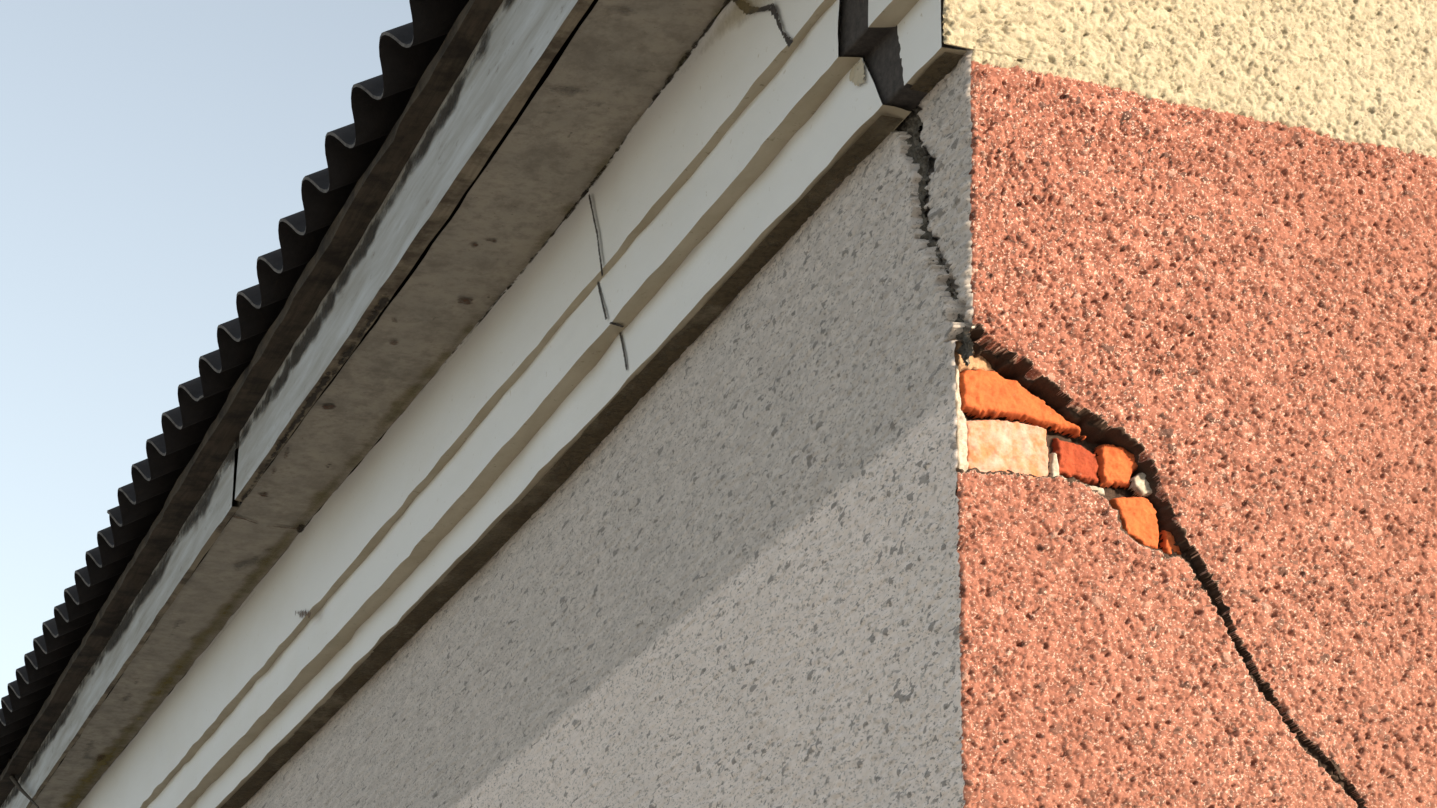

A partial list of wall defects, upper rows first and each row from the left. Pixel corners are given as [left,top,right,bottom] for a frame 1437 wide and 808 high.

flaking render [949,339,1181,560]
crack [1170,542,1360,808]